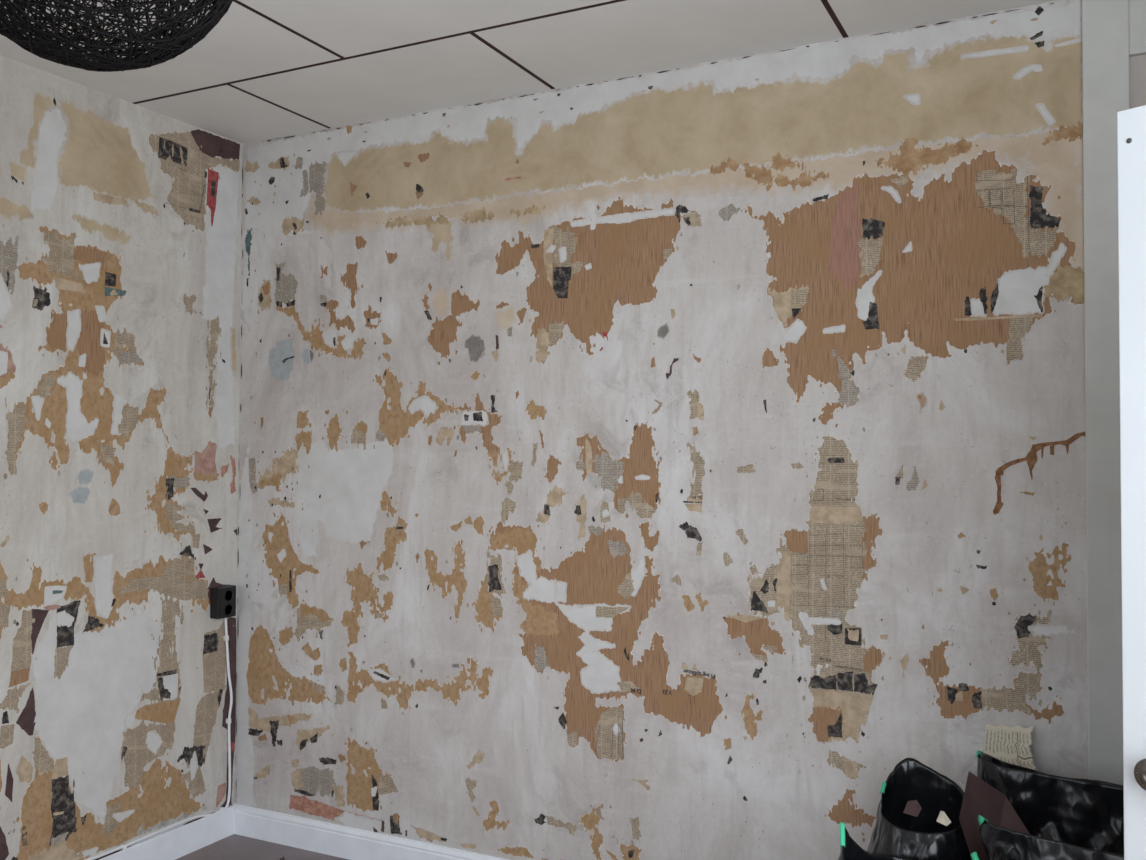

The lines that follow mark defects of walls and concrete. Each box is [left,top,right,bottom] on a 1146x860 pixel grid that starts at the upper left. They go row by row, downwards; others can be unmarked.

peeling [492,196,683,364]
peeling [741,149,1084,439]
peeling [0,225,169,516]
peeling [246,235,728,764]
peeling [0,553,214,641]
peeling [722,489,863,667]
peeling [1023,534,1071,616]
peeling [8,736,205,860]
peeling [332,728,398,812]
peeling [724,693,765,764]
peeling [802,678,874,743]
peeling [889,639,1065,724]